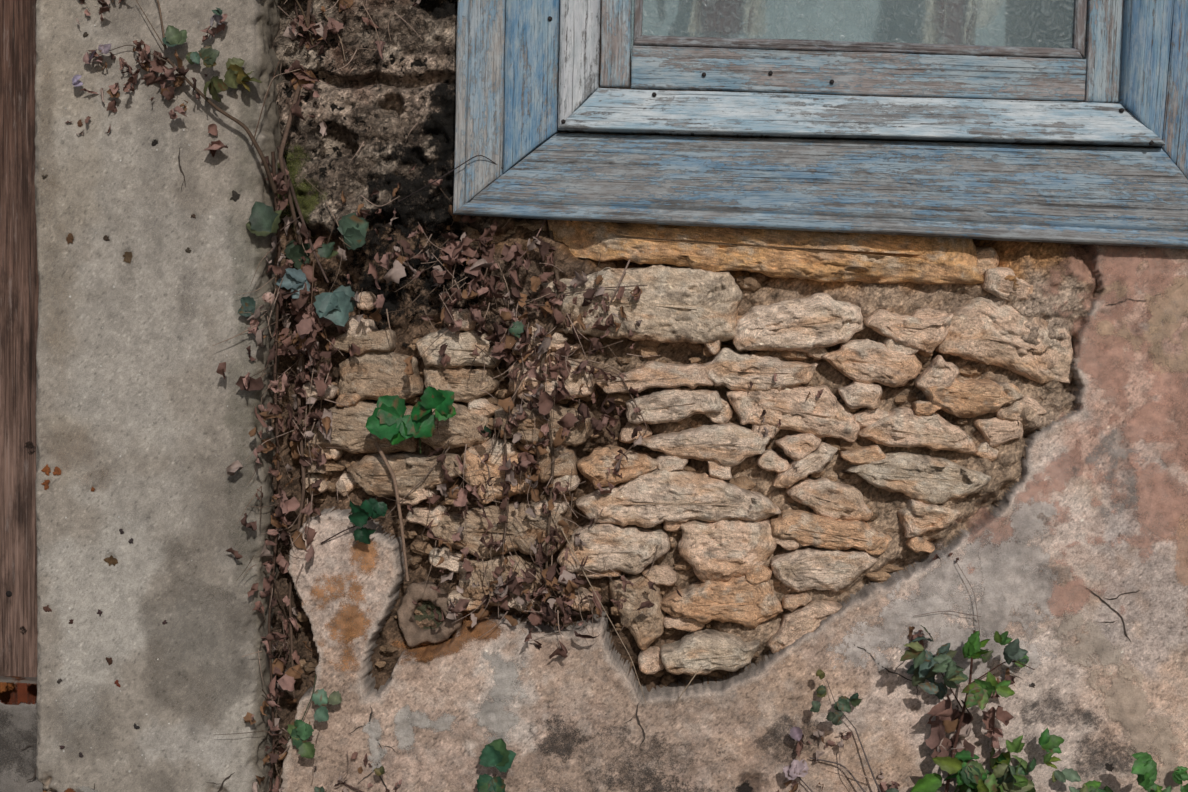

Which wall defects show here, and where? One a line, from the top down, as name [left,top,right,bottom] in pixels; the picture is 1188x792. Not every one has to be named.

corrosion [0,682,37,705]
spalling [268,0,1188,792]